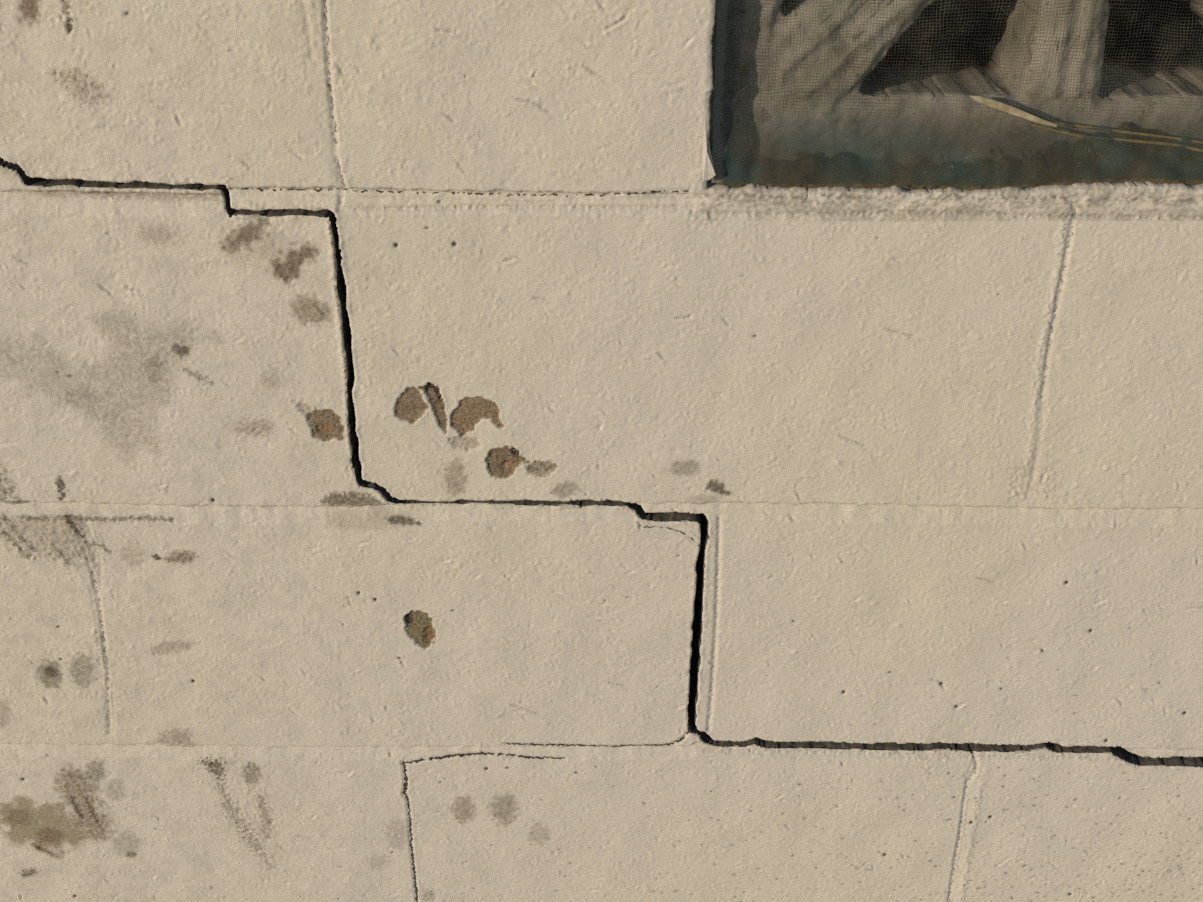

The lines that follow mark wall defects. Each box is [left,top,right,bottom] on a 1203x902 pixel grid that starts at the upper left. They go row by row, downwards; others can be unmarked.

crack [324,0,337,144]
peeling [309,409,344,441]
peeling [395,382,504,435]
peeling [486,446,557,478]
crack [0,157,1203,768]
peeling [405,610,436,648]